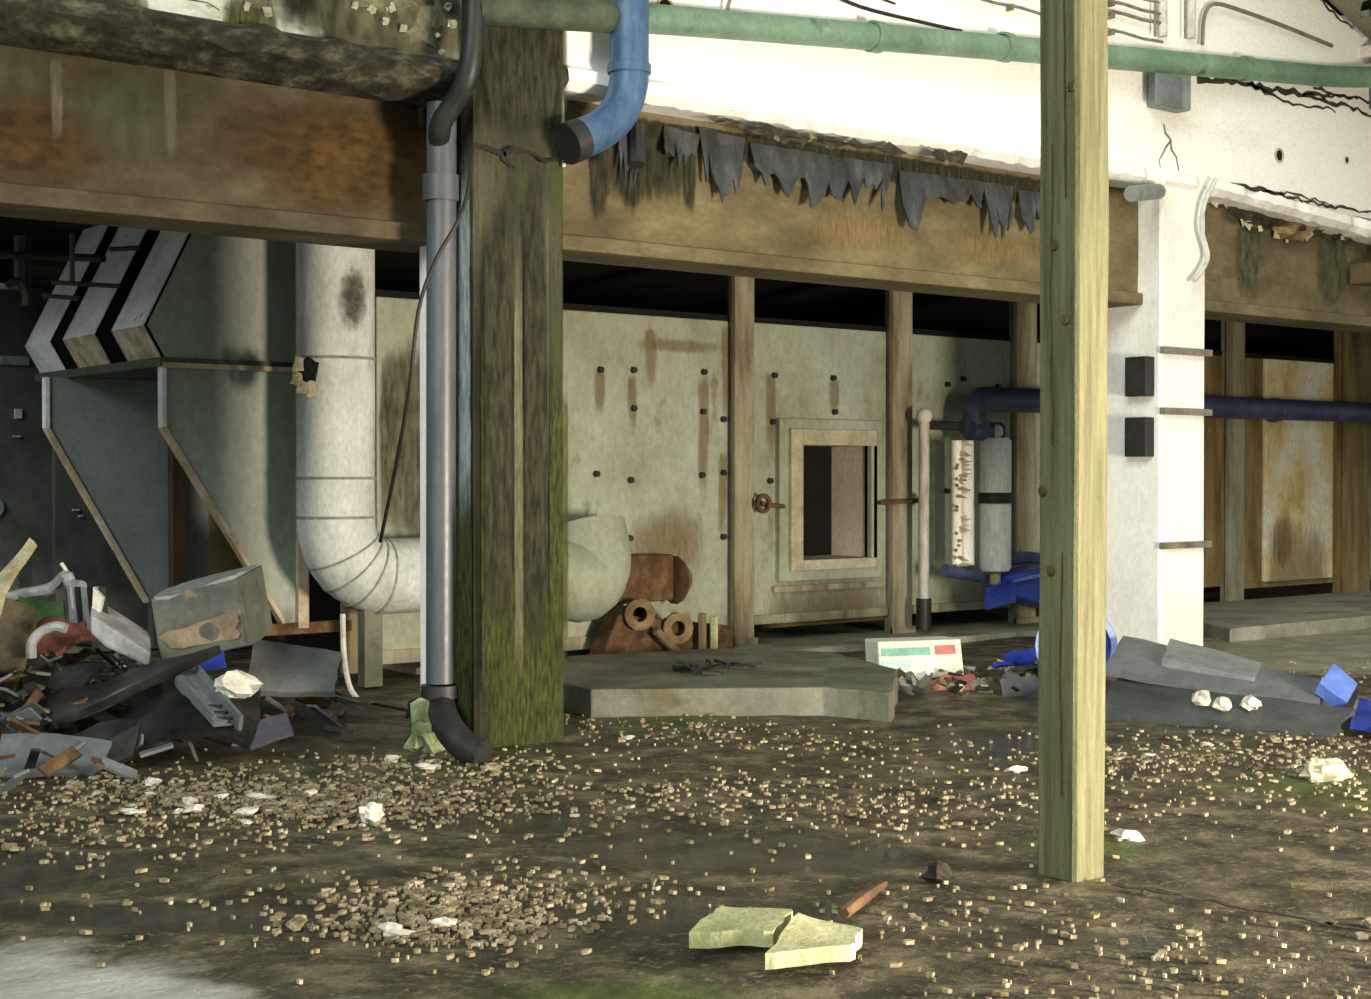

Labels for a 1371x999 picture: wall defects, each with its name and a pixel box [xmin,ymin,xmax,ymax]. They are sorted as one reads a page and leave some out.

peeling [243,0,274,17]
peeling [351,0,457,55]
crack [1197,76,1371,117]
peeling [618,135,638,192]
peeling [663,117,1040,241]